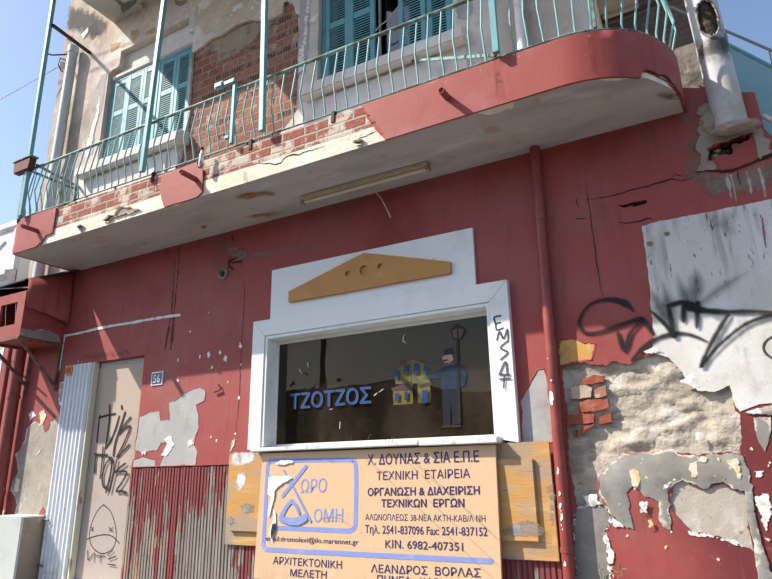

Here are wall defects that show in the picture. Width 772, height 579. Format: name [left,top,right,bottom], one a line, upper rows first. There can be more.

water stain [66,9,107,41]
peeling [85,73,107,157]
flaking render [179,0,310,168]
crack [642,70,682,94]
hole [710,143,739,160]
crack [576,154,772,296]
flaking render [2,381,64,515]
flaking render [131,386,206,468]
flaking render [519,358,554,444]
peeling [557,199,772,579]